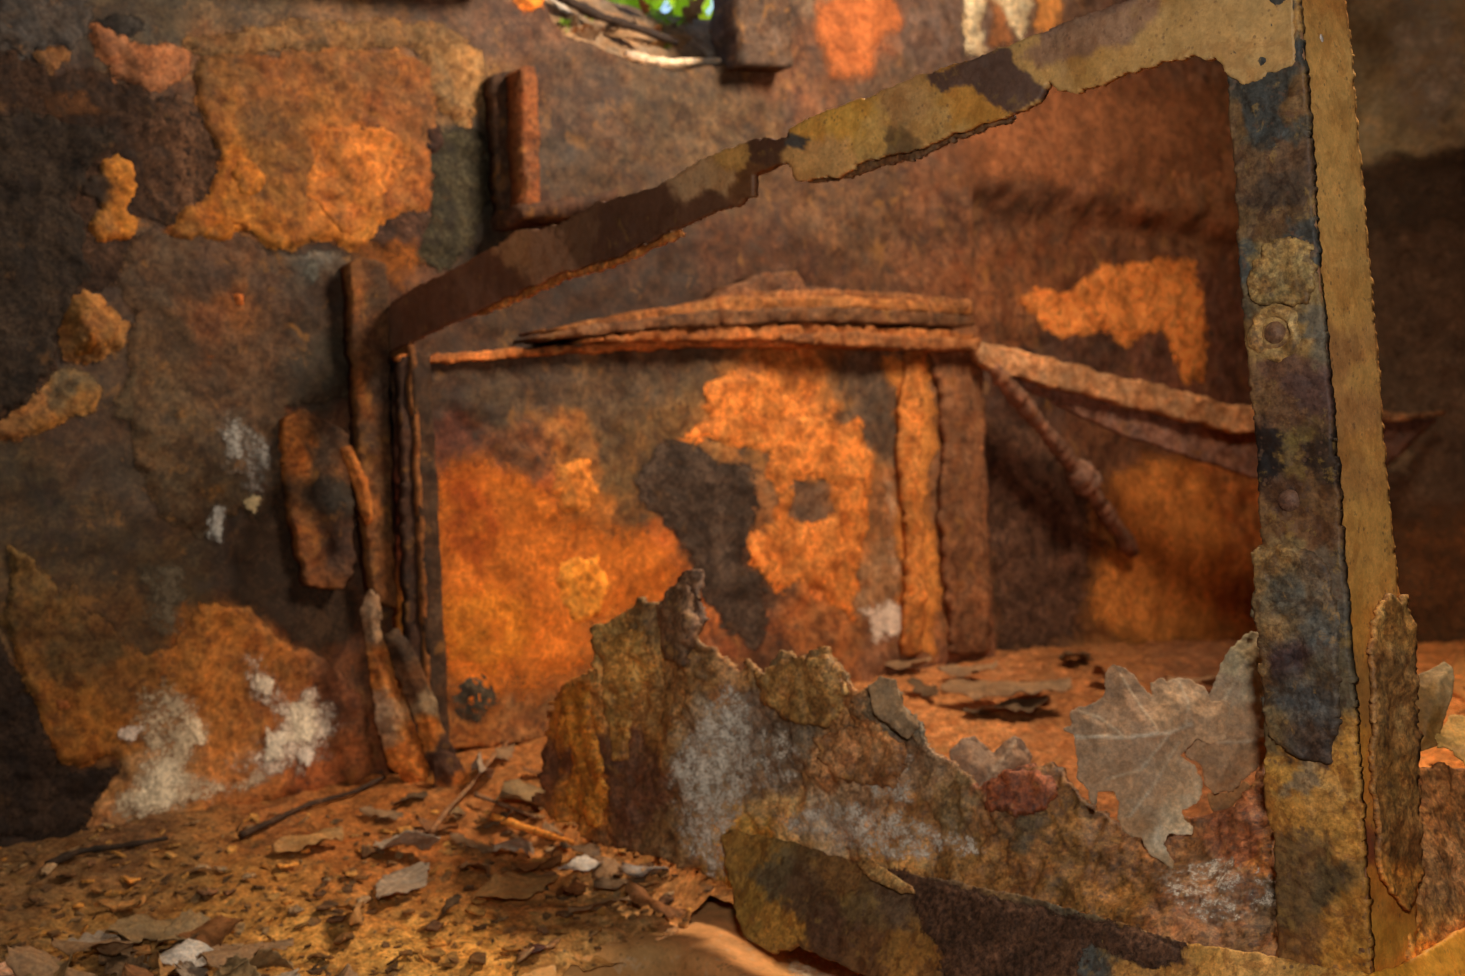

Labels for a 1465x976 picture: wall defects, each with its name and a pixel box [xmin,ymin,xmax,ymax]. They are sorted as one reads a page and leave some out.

corrosion [0,0,487,540]
corrosion [438,456,675,707]
water stain [102,660,336,824]